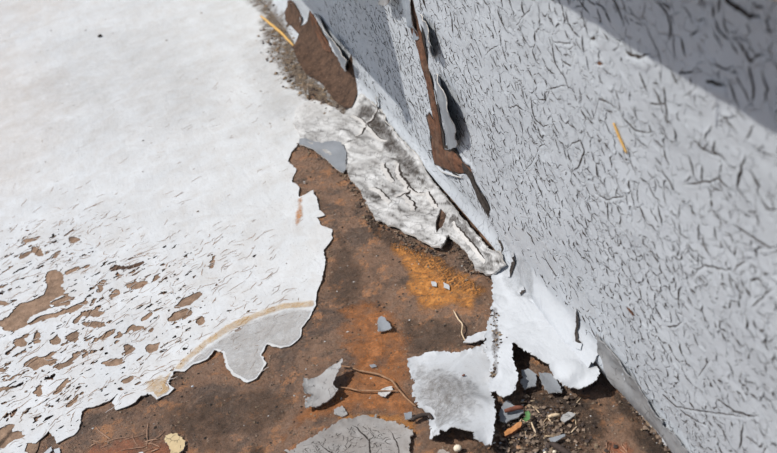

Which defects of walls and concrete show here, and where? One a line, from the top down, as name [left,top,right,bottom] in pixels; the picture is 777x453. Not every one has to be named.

leakage [251,0,346,114]
spalling [283,0,360,113]
peeling [0,424,60,453]
peeling [33,379,84,407]
peeling [0,237,205,392]
crack [0,174,308,453]
peeling [164,433,186,453]
crack [284,414,401,453]
rust [298,304,412,430]
rust [393,246,481,307]
peeling [290,223,607,453]
crack [318,0,777,453]